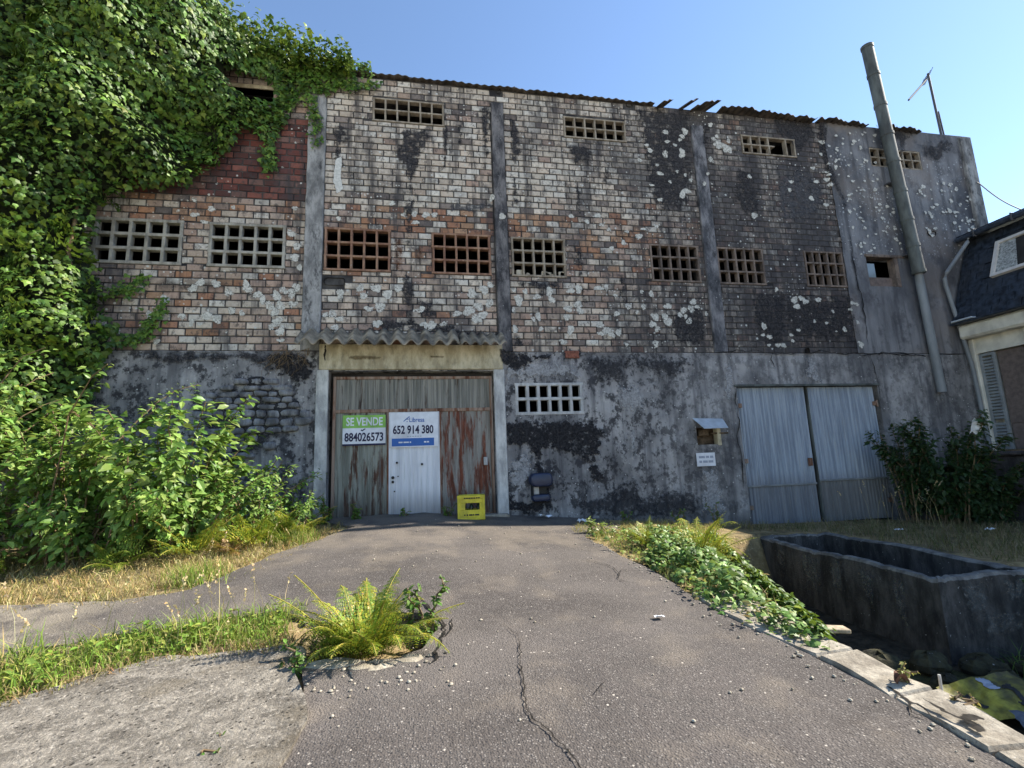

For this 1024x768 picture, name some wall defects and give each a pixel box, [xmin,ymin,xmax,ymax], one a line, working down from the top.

water stain [480,106,490,154]
water stain [395,121,463,246]
water stain [637,108,692,221]
water stain [734,168,759,215]
water stain [135,351,317,386]
mould [581,354,694,384]
spalling [188,376,313,459]
mould [506,419,606,514]
water stain [575,470,726,519]